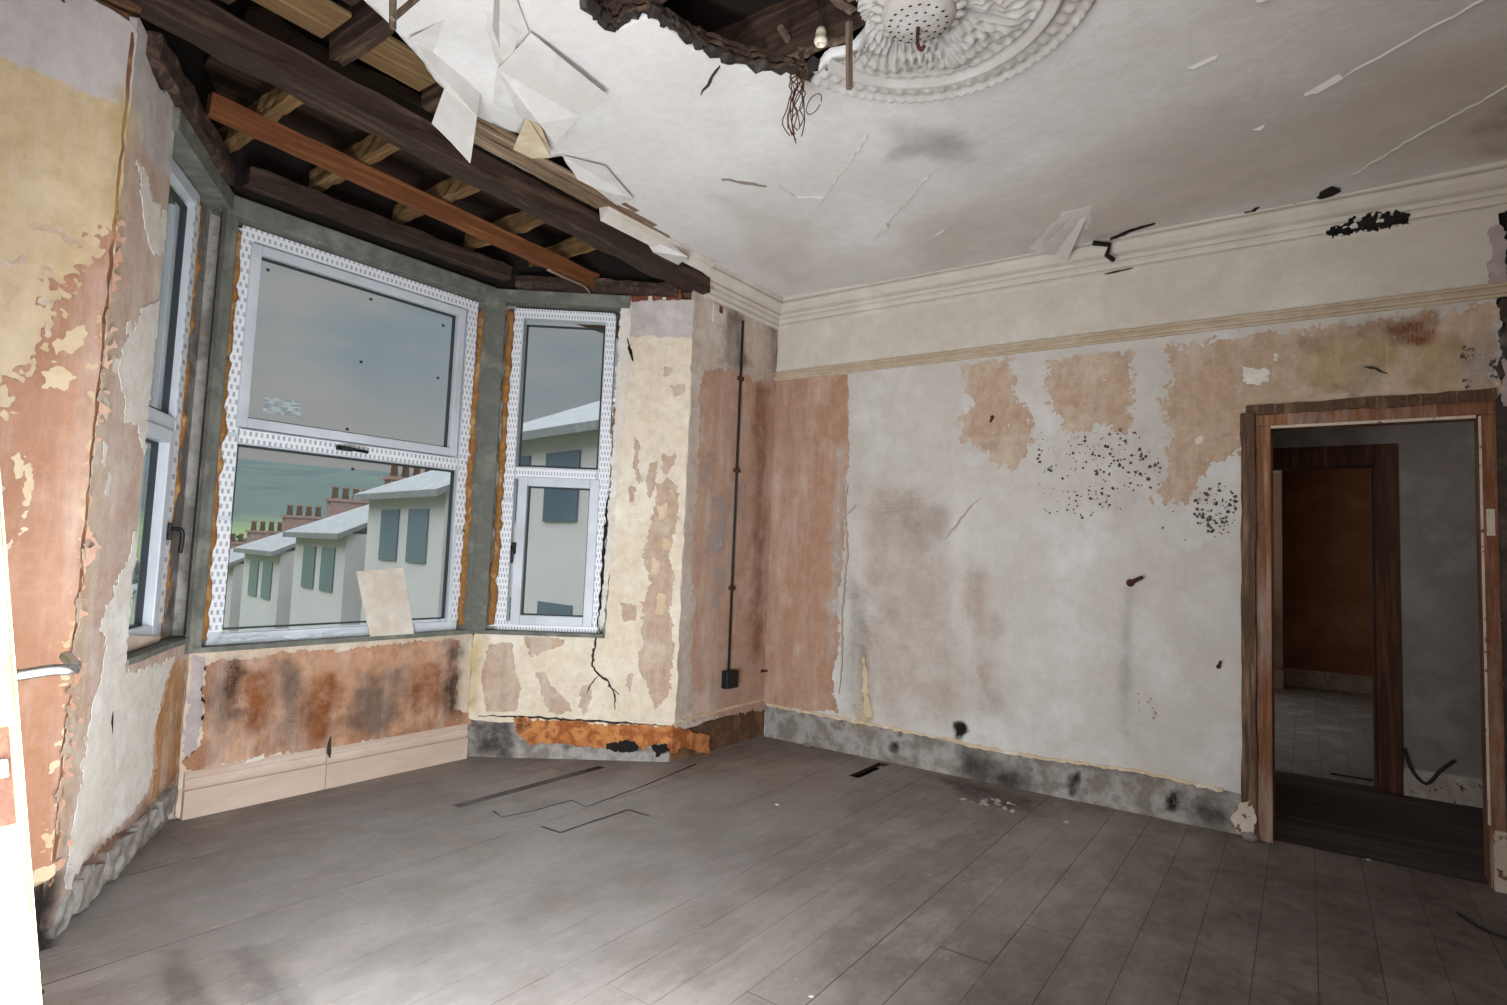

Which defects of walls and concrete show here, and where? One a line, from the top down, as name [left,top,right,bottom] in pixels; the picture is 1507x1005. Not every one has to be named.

spalling [579,0,820,81]
peeling [136,160,167,256]
spalling [1486,225,1507,284]
spalling [630,289,682,302]
flaking render [1148,301,1507,506]
damp [1031,428,1161,519]
damp [1193,483,1238,538]
peeling [0,220,592,941]
crack [481,491,671,727]
damp [225,661,267,728]
damp [414,652,477,709]